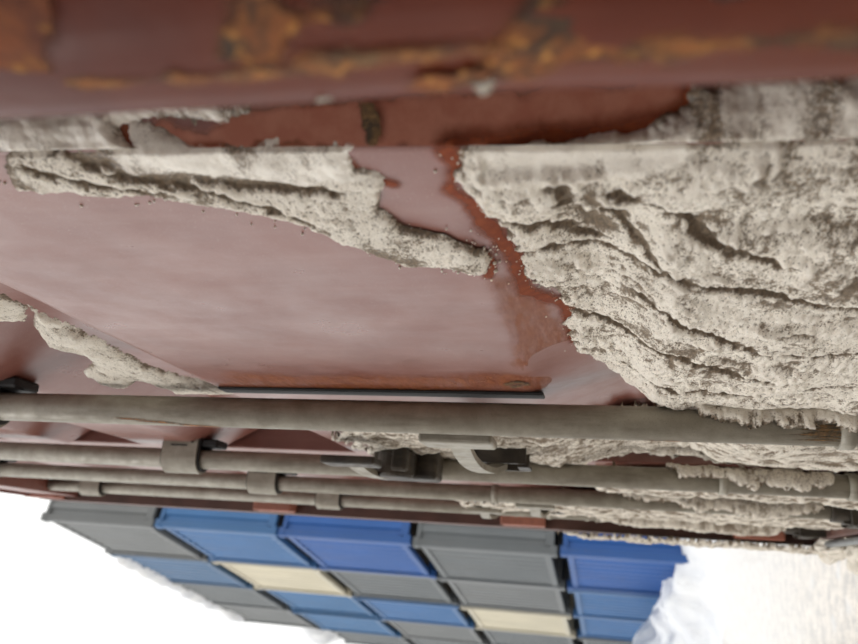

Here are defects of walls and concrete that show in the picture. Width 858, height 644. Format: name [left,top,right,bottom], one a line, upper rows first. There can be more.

corrosion [0,0,52,73]
corrosion [154,0,681,147]